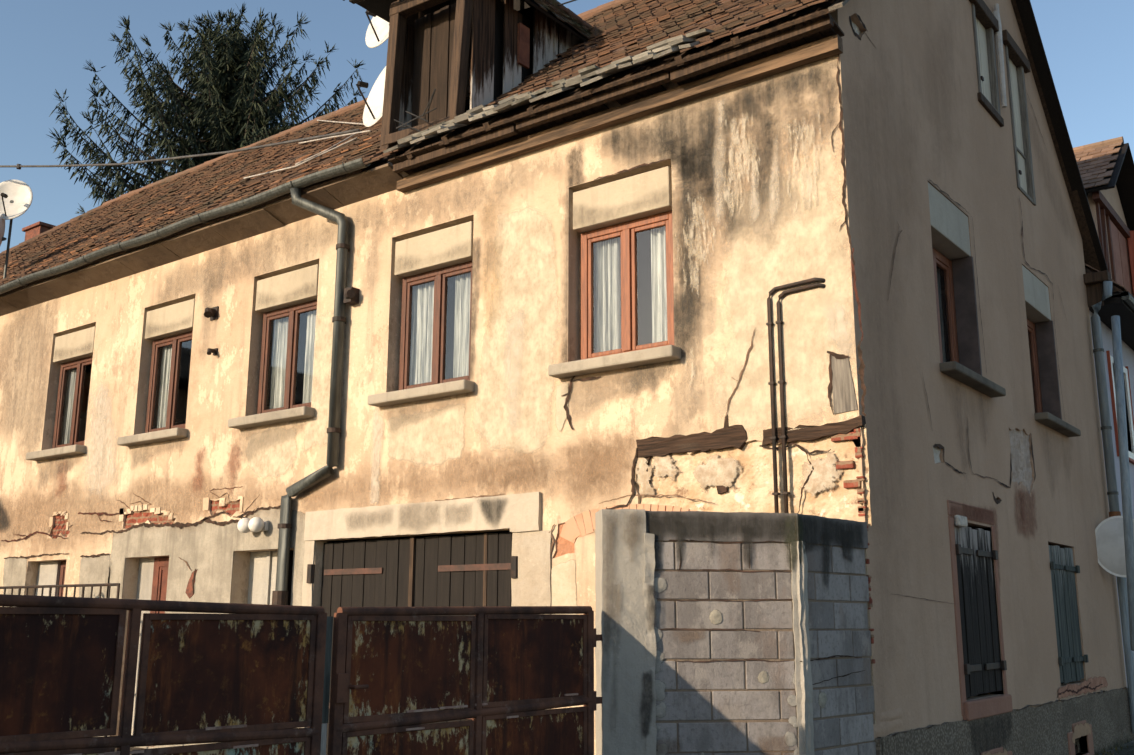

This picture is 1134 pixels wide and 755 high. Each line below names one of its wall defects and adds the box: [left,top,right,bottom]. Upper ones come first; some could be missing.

water stain [607,63,853,430]
crack [827,54,866,416]
crack [562,376,601,430]
crack [724,329,755,424]
crack [945,417,1012,488]
flaking render [49,511,73,539]
flaking render [116,495,176,529]
flaking render [203,486,259,516]
water stain [647,512,786,569]
flaking render [634,415,873,610]
water stain [802,518,863,585]